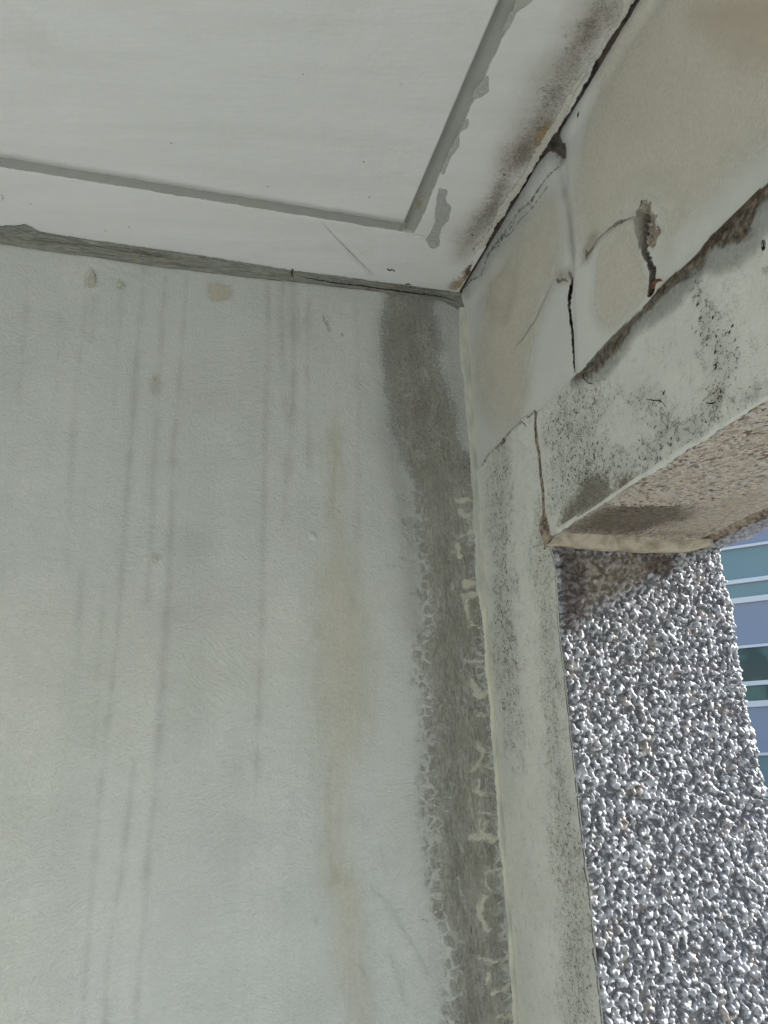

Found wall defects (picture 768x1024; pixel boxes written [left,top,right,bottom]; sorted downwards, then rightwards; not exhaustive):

peeling [426,189,451,248]
crack [516,271,597,384]
crack [594,209,656,297]
water stain [535,183,768,533]
water stain [380,293,524,1024]
water stain [527,533,595,1024]